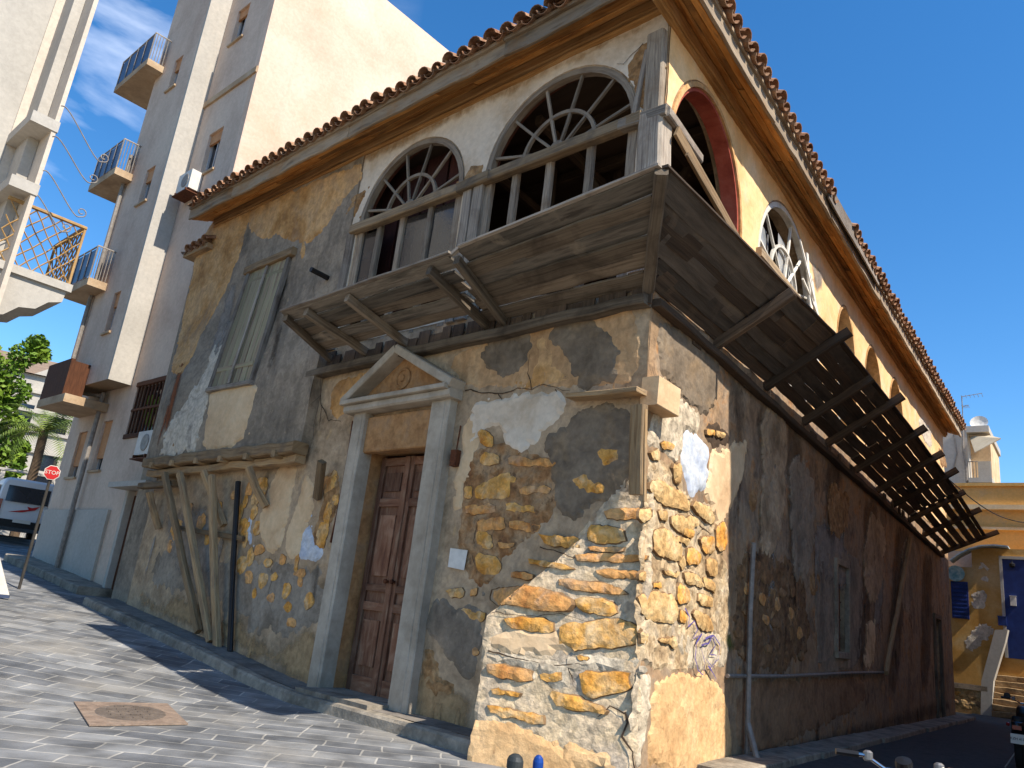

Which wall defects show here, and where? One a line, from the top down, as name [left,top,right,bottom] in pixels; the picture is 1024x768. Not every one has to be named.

flaking render [172,164,370,374]
flaking render [159,345,258,456]
flaking render [330,371,367,419]
crack [465,354,569,400]
flaking render [594,310,641,388]
spalling [451,328,579,596]
flaking render [220,466,340,628]
spalling [628,323,876,767]
flaking render [489,627,574,656]
flaking render [467,720,615,768]
crack [598,705,635,768]